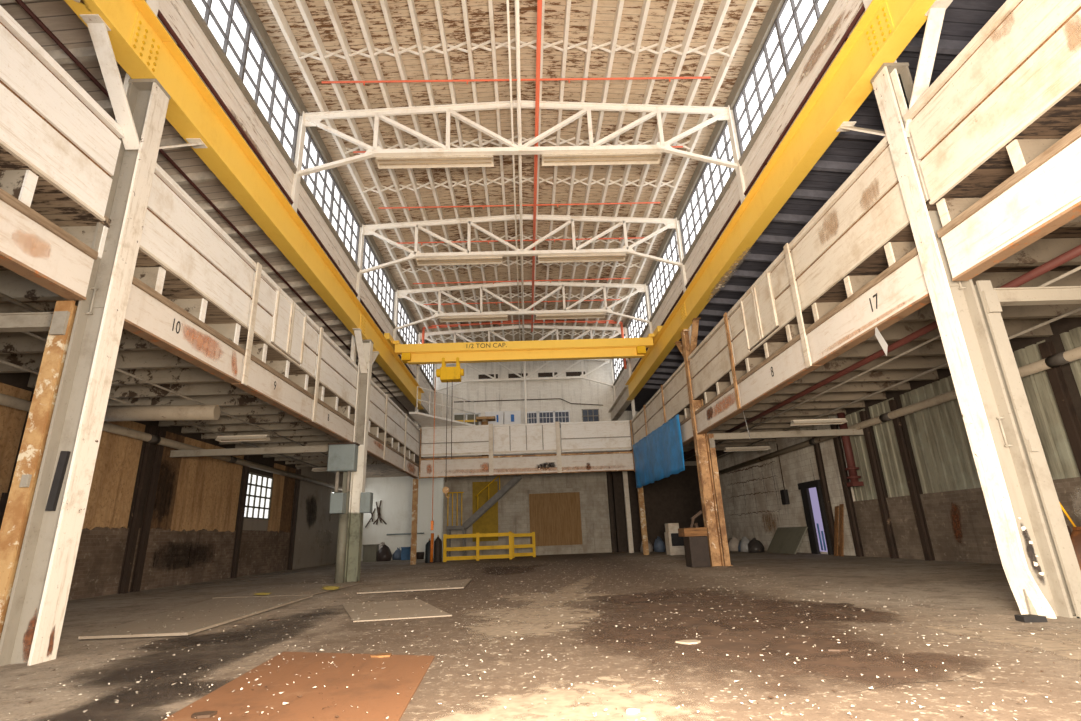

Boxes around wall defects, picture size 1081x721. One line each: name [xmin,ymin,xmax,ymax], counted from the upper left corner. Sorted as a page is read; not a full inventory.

damp [1067,23,1081,47]
corrosion [186,329,215,355]